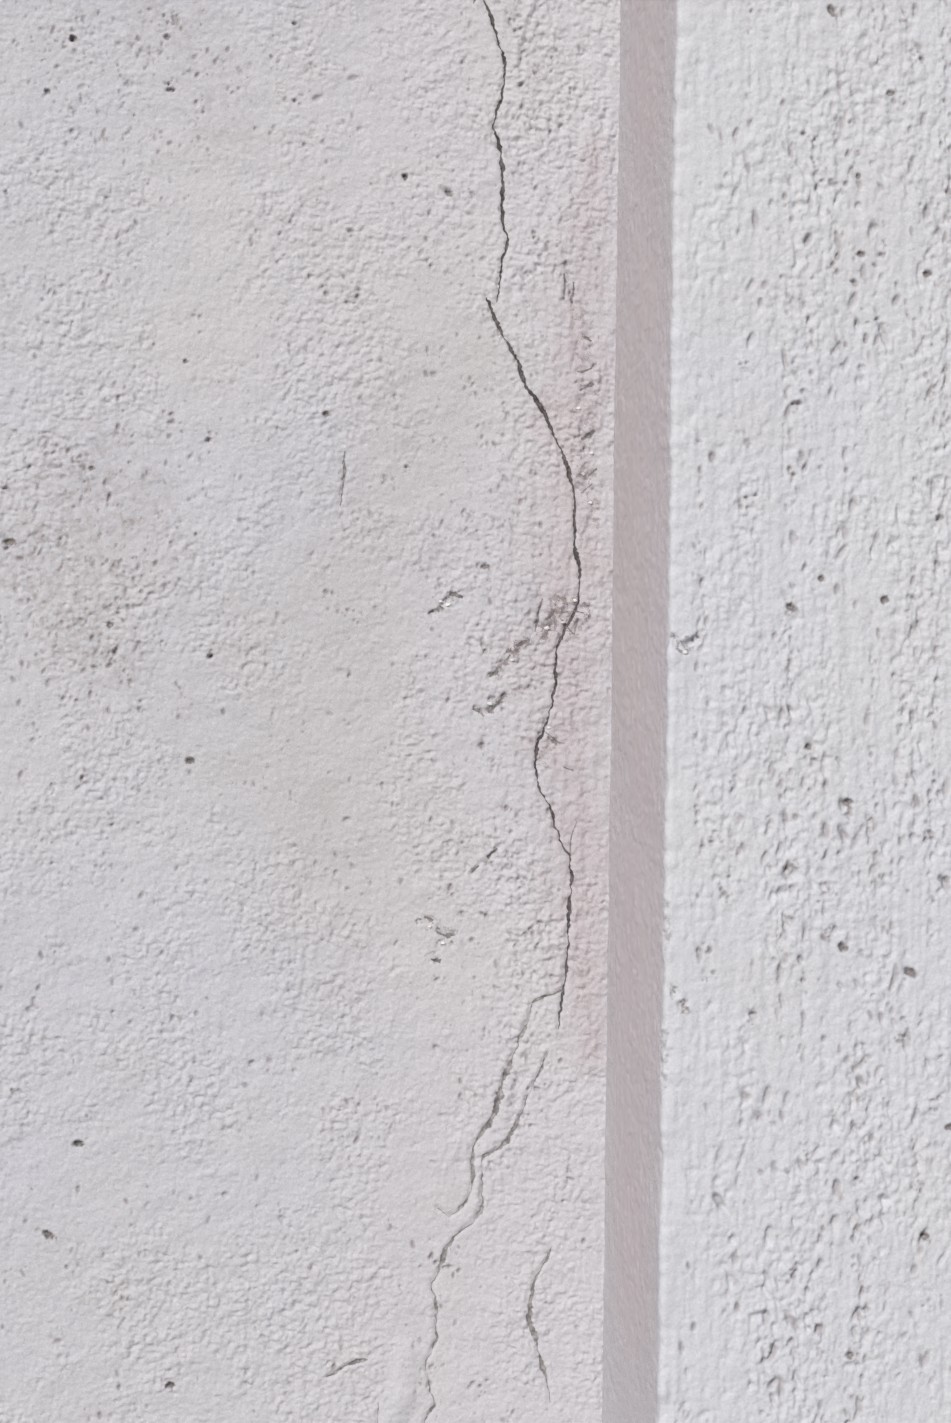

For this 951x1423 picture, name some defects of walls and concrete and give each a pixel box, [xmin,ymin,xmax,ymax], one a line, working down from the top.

crack [424,0,584,1423]